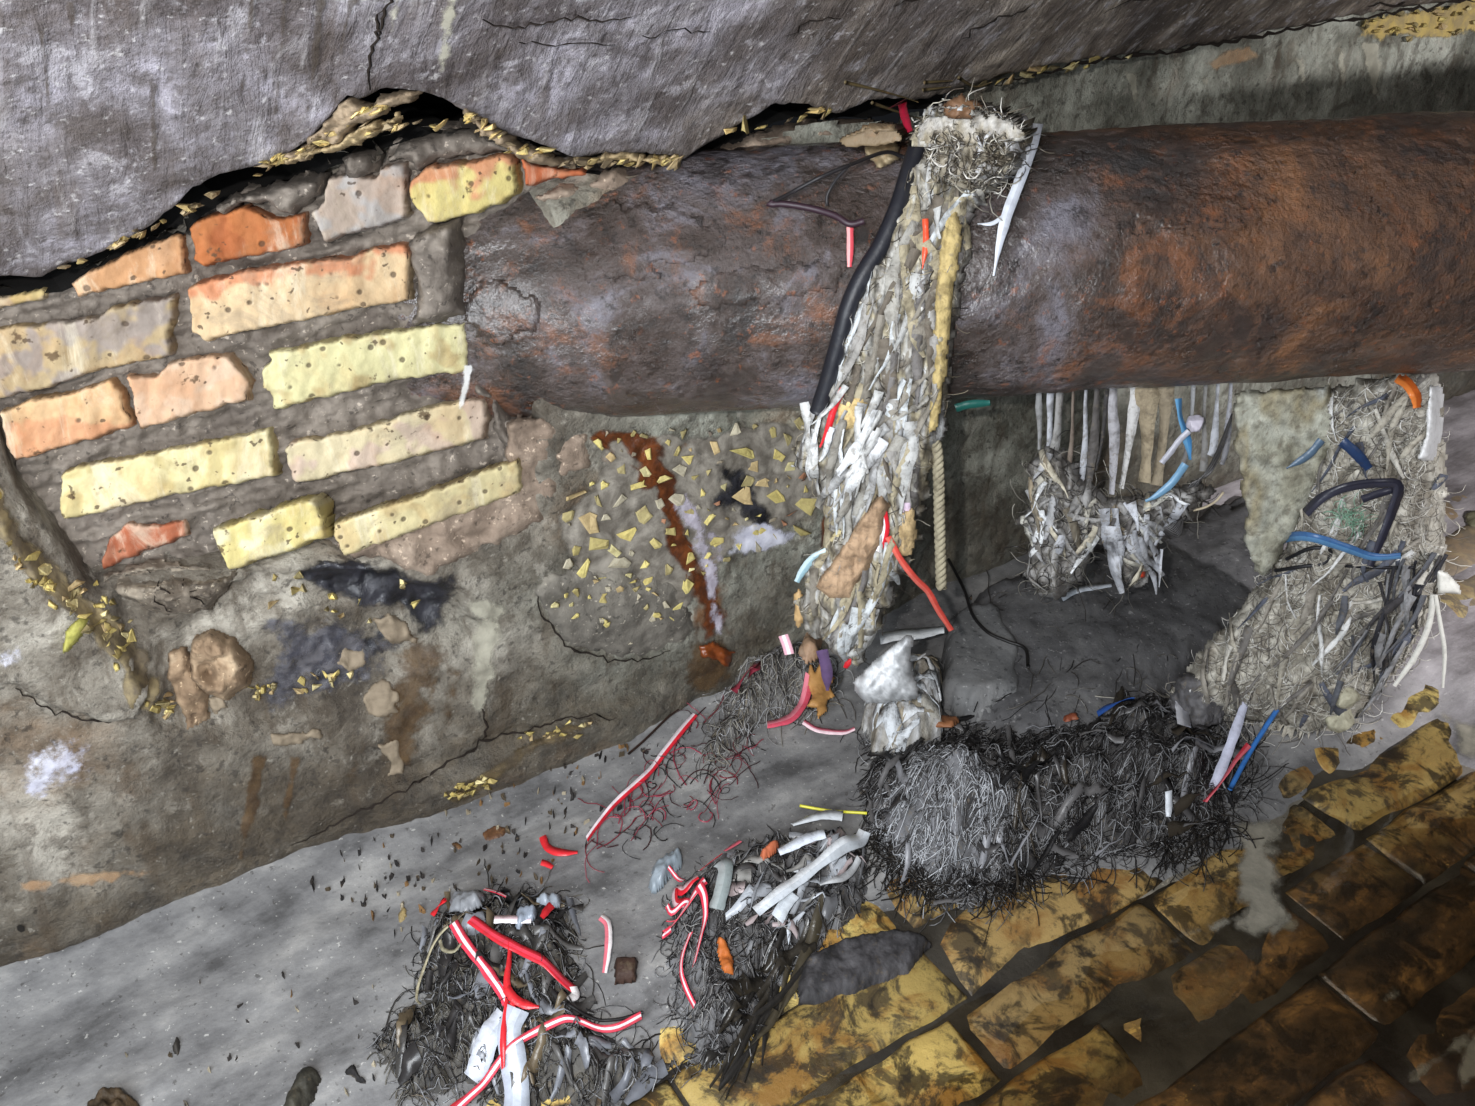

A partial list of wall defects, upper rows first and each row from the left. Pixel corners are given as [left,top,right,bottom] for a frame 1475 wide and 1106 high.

crack [482,15,710,47]
crack [0,0,464,295]
spalling [253,90,685,176]
crack [505,137,602,174]
spalling [723,106,832,135]
crack [699,94,944,149]
spalling [106,190,221,250]
corrosion [591,431,735,691]
spalling [0,488,177,720]
crack [15,688,111,724]
spalling [248,648,366,701]
water stain [265,601,503,764]